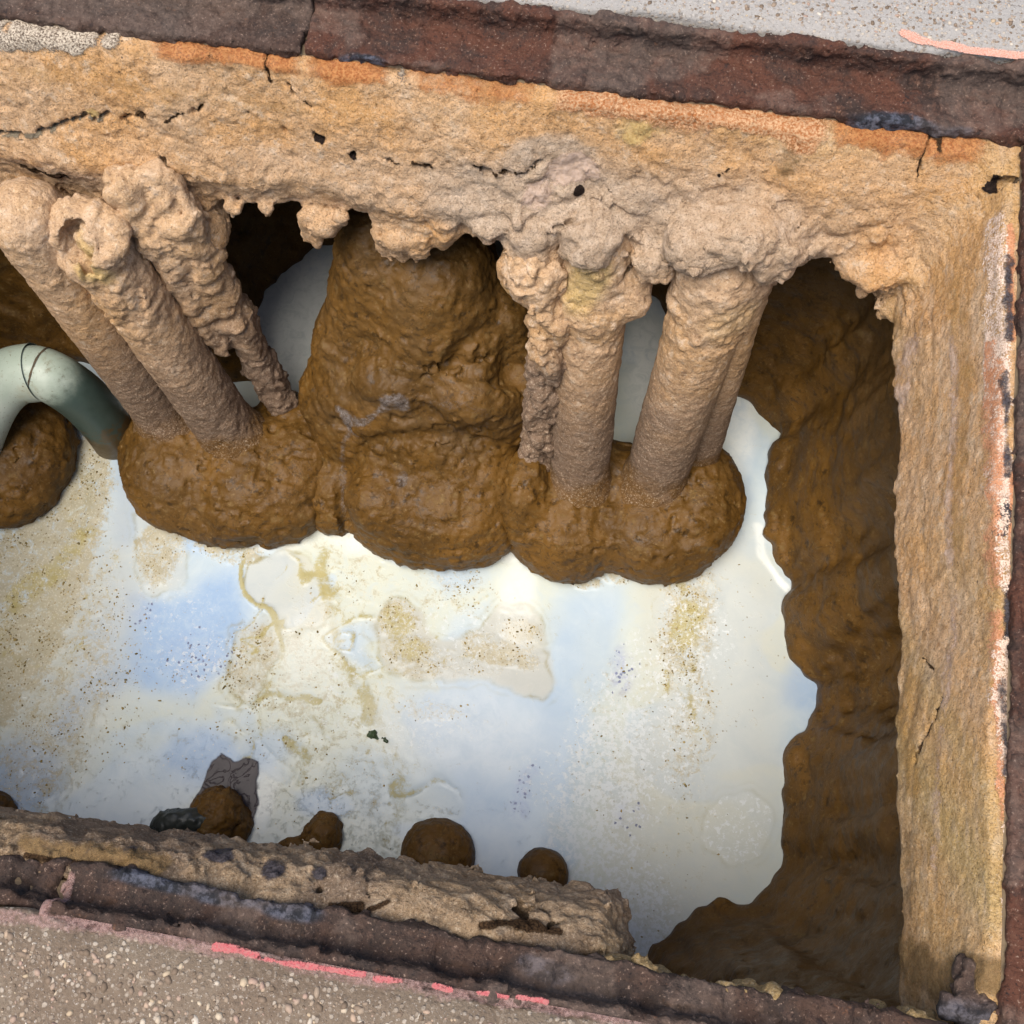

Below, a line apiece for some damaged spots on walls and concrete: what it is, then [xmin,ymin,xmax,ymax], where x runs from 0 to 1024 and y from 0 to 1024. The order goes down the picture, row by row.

crack [0,104,204,139]
rust [555,90,985,165]
crack [917,135,942,178]
crack [915,697,943,765]